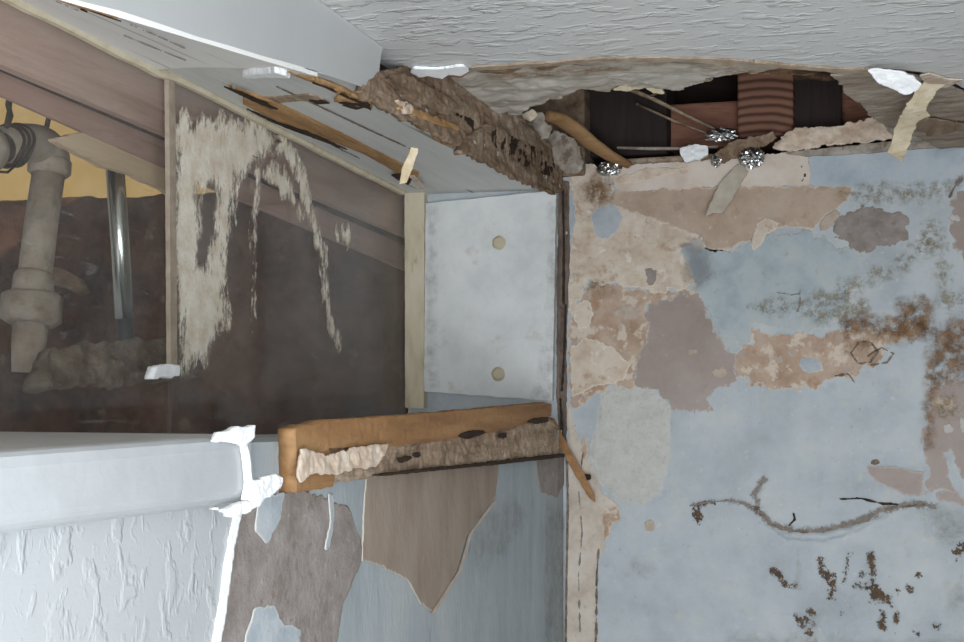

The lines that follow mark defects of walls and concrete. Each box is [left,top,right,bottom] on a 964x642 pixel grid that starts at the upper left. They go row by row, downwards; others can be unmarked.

spalling [224,67,424,189]
peeling [868,68,945,161]
water stain [248,132,341,352]
water stain [811,293,932,345]
peeling [535,163,913,642]
peeling [221,465,499,642]
crack [689,476,936,533]
peeling [867,459,924,497]